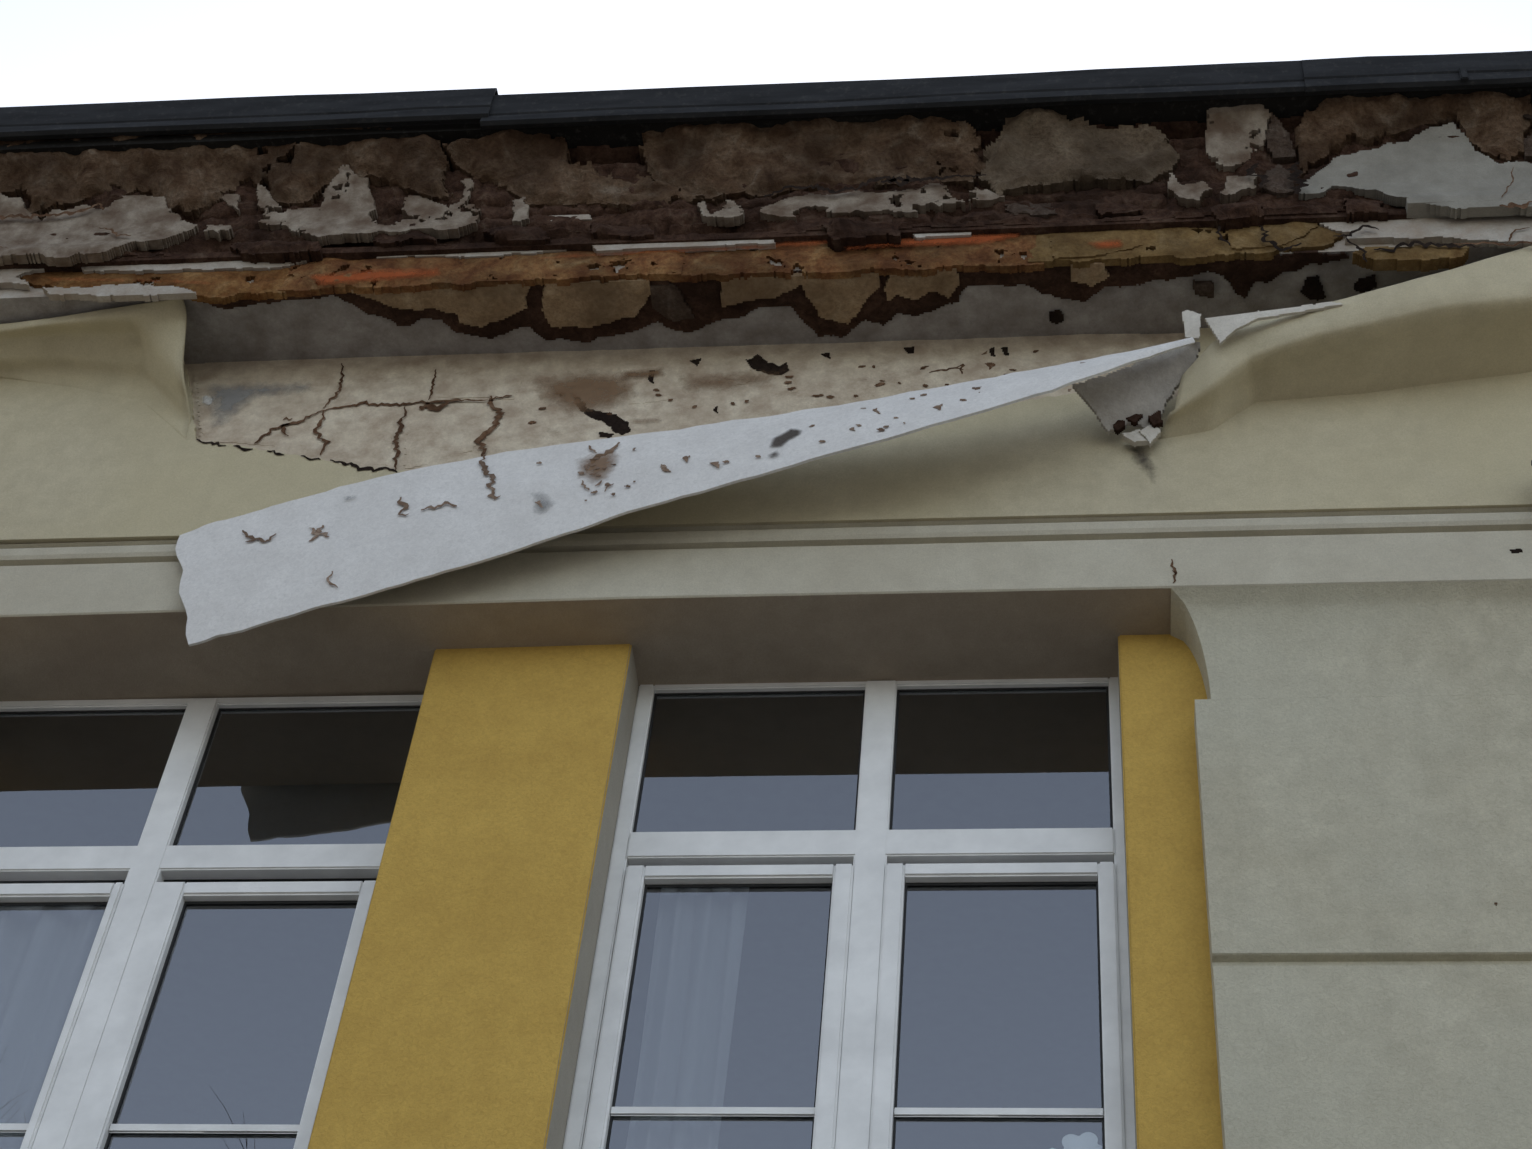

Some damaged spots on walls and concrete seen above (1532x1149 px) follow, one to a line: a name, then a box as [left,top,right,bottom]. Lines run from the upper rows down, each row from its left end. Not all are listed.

crack [196,363,512,516]
spalling [0,91,1532,647]